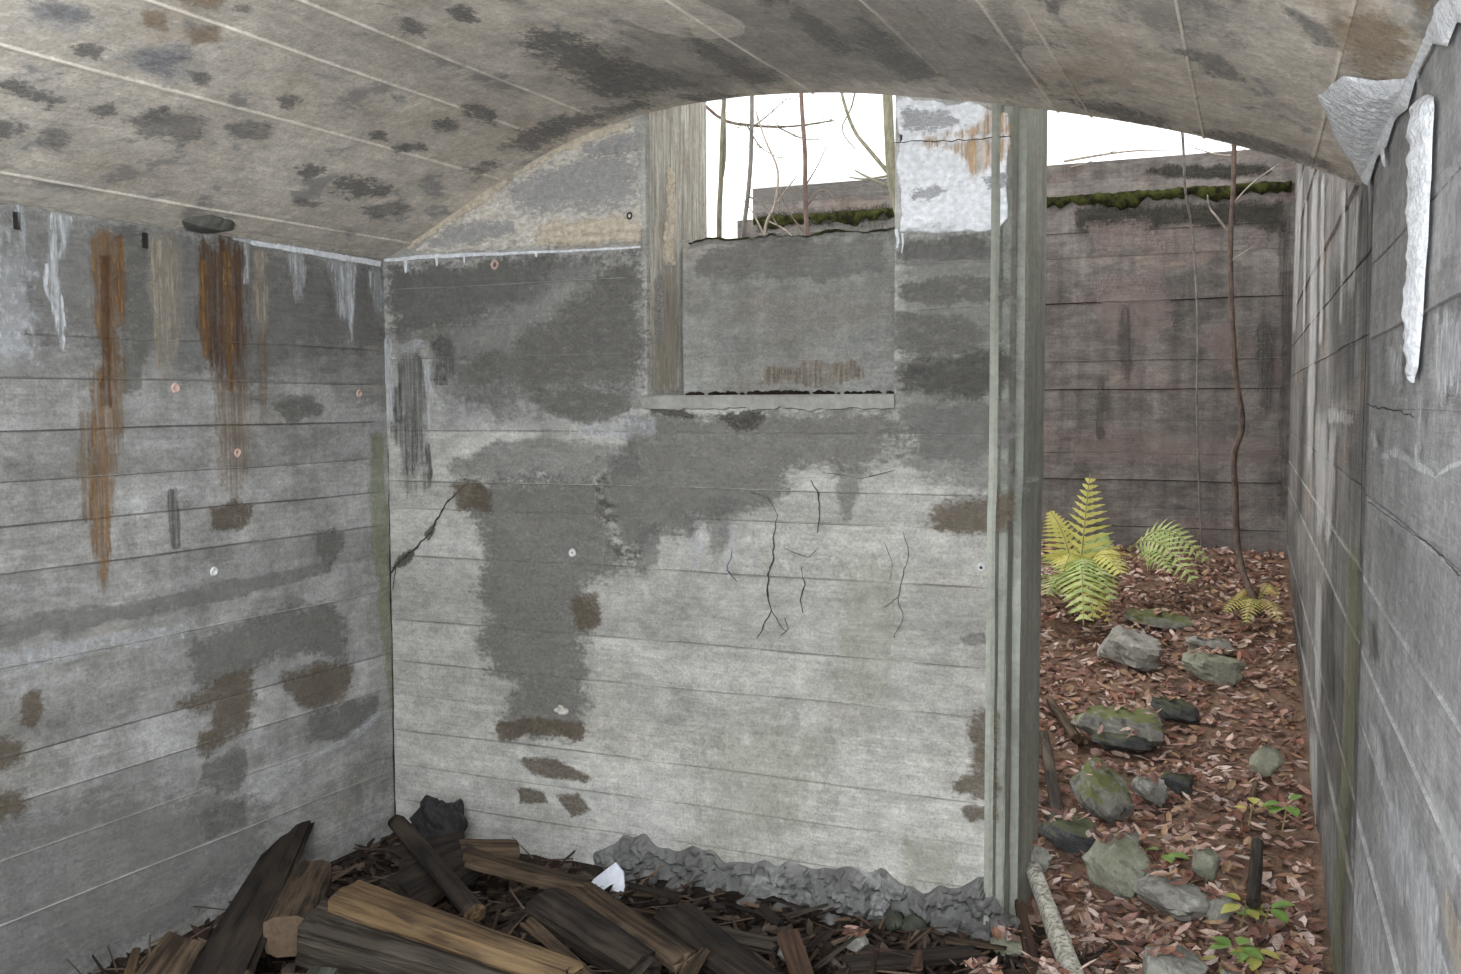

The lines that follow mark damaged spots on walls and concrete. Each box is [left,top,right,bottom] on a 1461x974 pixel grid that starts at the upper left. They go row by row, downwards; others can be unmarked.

rust [81,229,125,582]
rust [199,237,247,444]
rust [210,500,253,531]
crack [388,453,467,815]
leakage [0,173,1031,822]
crack [727,470,894,638]
crack [884,532,909,638]
leakage [1434,316,1461,397]
leakage [0,604,377,974]